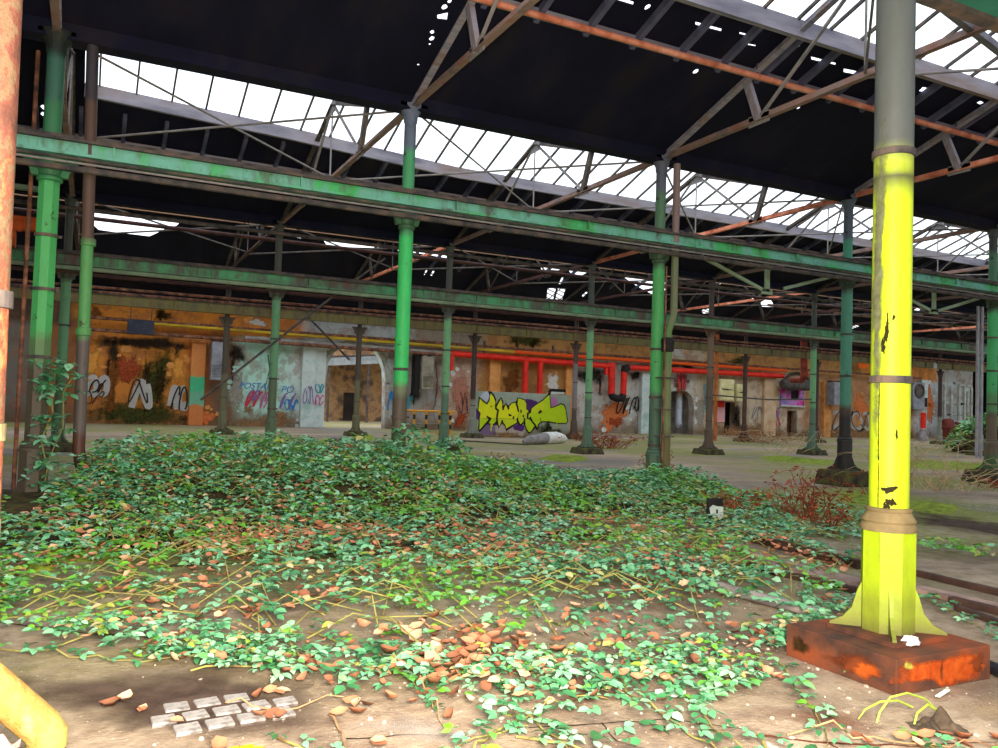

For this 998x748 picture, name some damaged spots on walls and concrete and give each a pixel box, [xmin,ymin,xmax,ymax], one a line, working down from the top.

water stain [89,337,191,424]
spalling [852,371,898,509]
corrosion [794,638,808,652]
corrosion [833,655,879,678]
corrosion [900,654,983,686]